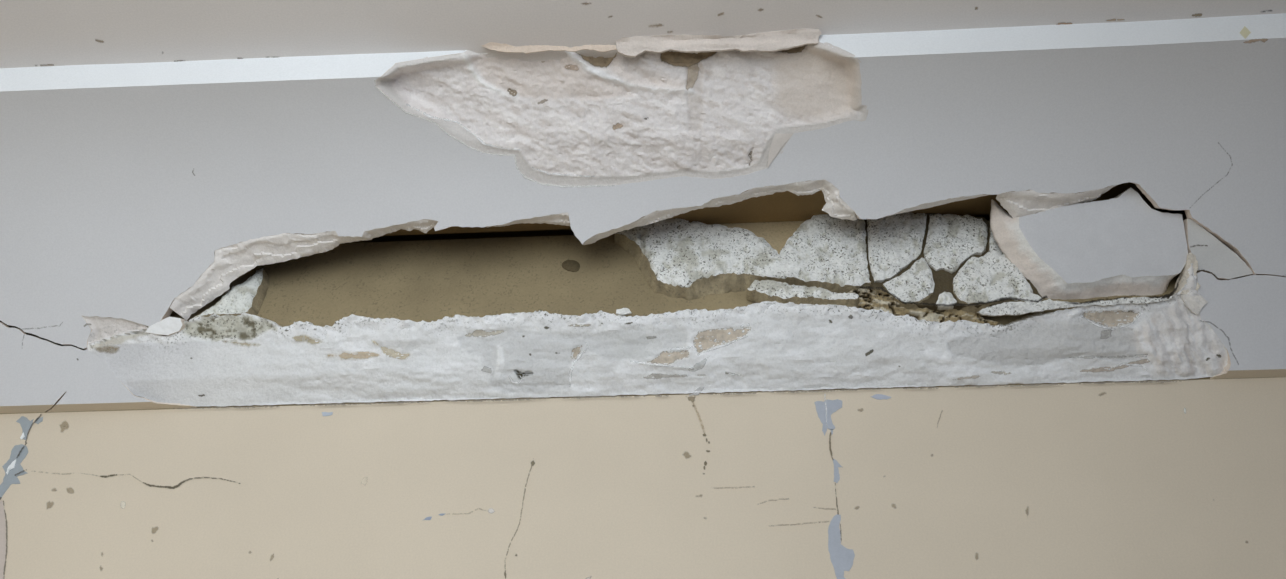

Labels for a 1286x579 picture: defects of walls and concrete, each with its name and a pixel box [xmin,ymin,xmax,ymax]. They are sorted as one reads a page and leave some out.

spalling [374,29,868,187]
crack [856,245,1217,306]
crack [0,321,91,350]
spalling [77,179,1228,579]
peeling [0,416,43,579]
crack [100,474,240,489]
crack [504,461,535,578]